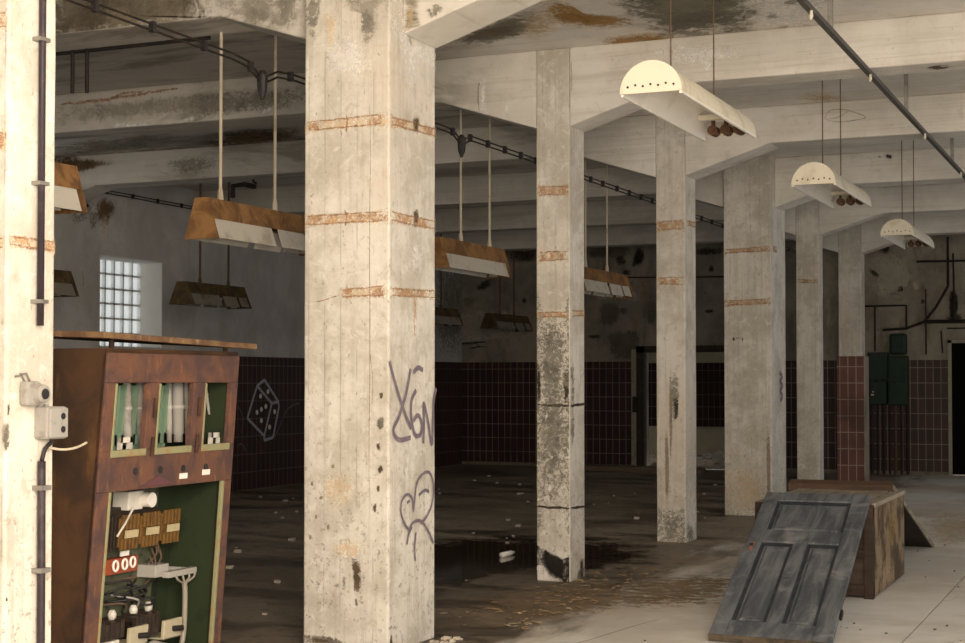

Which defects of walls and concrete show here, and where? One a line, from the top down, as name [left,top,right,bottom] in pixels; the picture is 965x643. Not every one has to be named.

damp [461,0,756,44]
damp [54,88,306,173]
rust [308,114,435,136]
damp [90,199,114,228]
rust [305,211,435,229]
damp [434,294,575,540]